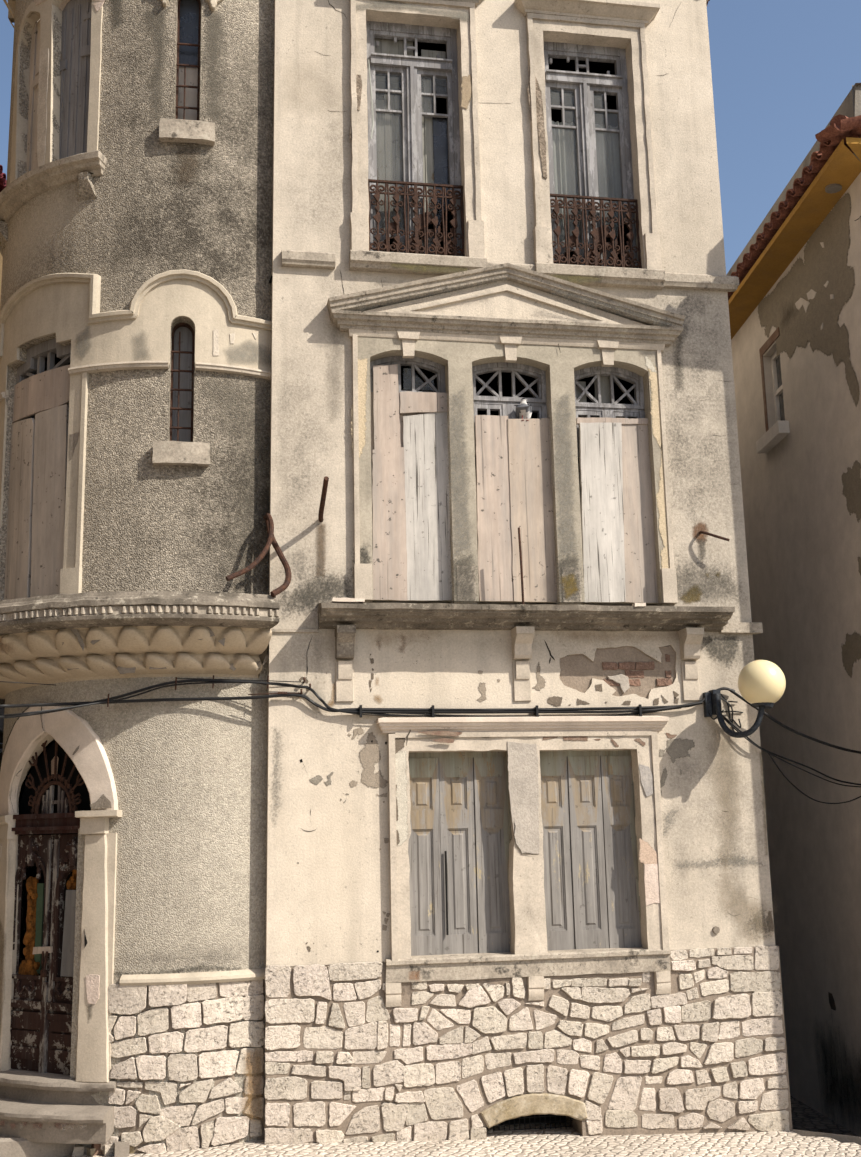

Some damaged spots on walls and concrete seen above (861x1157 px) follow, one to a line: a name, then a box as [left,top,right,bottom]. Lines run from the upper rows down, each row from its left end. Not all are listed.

peeling [758,193,859,407]
peeling [841,460,861,522]
rust [694,523,707,541]
spalling [532,645,679,707]
peeling [841,632,861,678]
peeling [340,727,462,850]
peeling [507,736,619,854]
peeling [639,733,695,797]